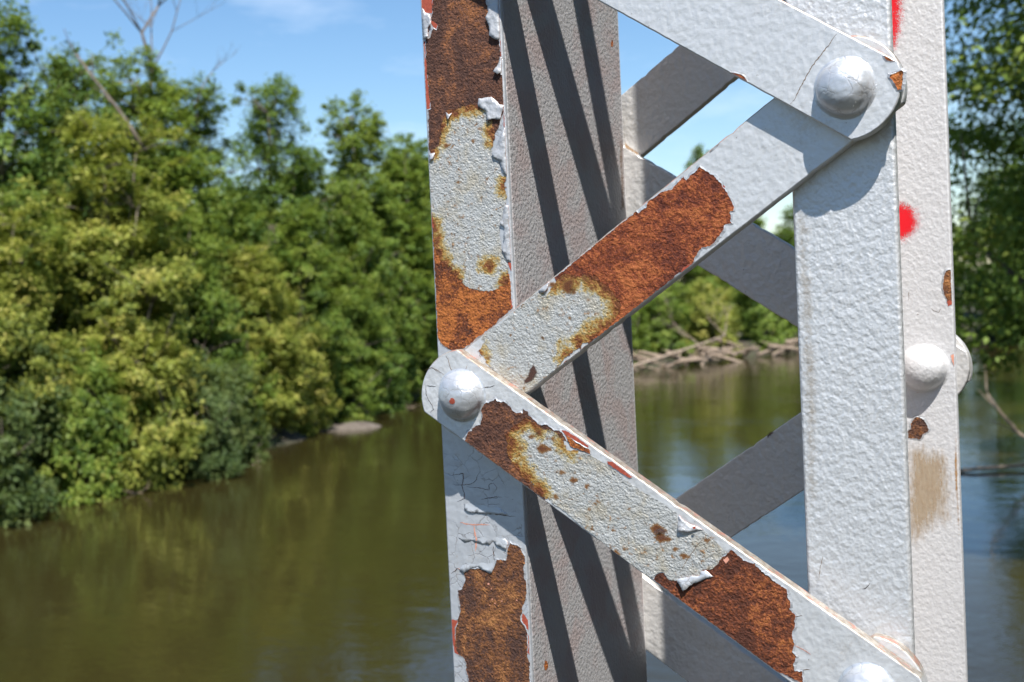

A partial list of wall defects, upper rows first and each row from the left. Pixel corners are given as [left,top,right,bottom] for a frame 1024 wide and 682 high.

rust [421,0,505,151]
rust [431,206,513,351]
rust [554,144,736,364]
rust [464,396,568,501]
crack [452,472,515,573]
rust [452,540,531,682]
rust [652,548,805,682]